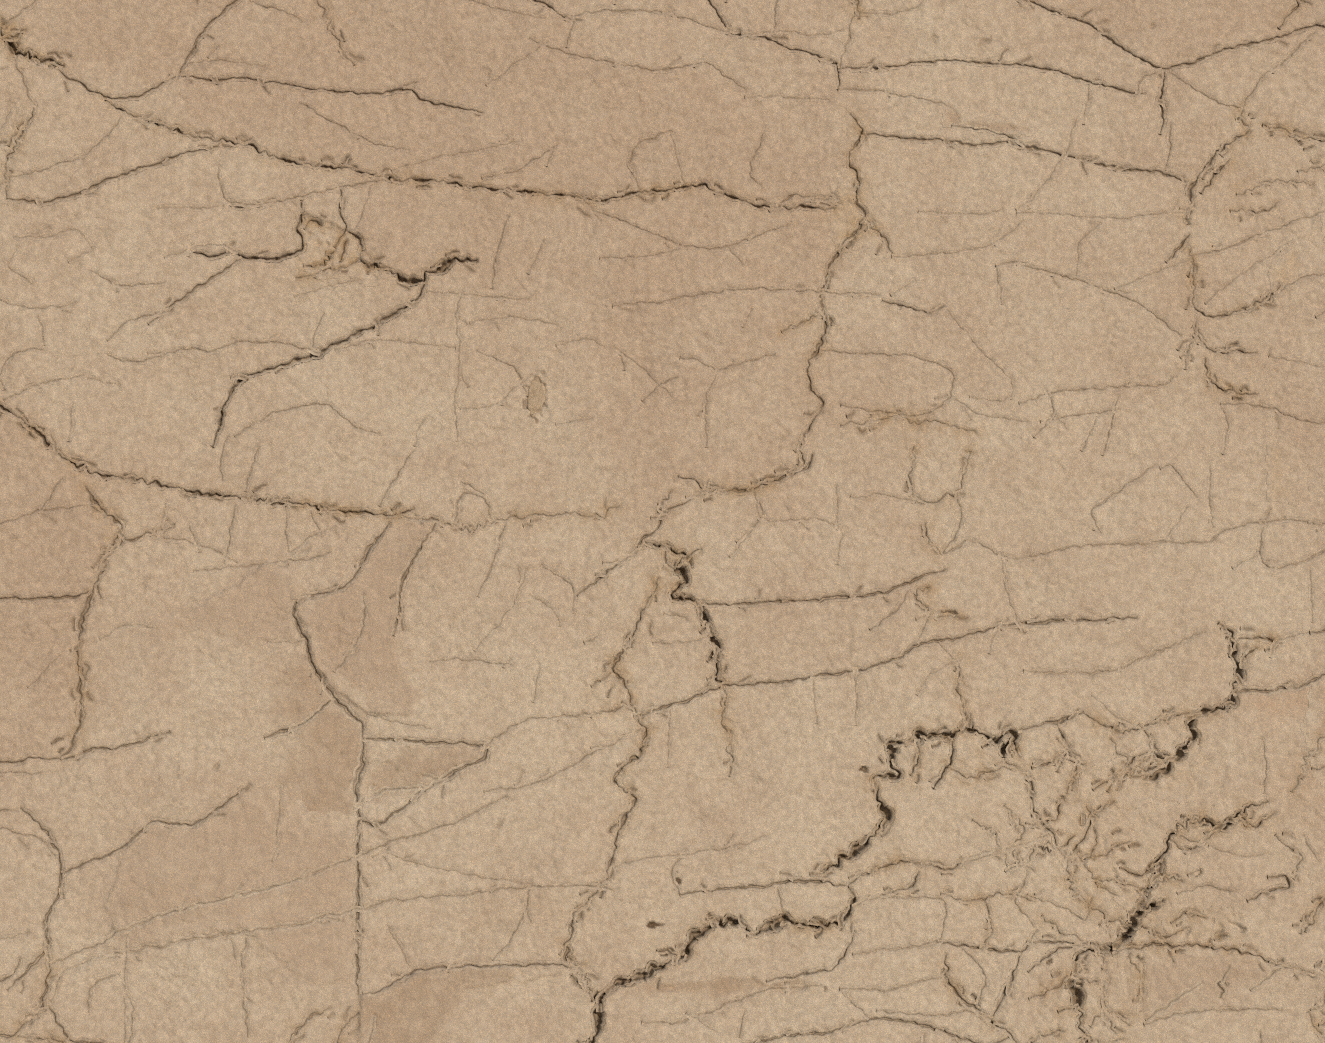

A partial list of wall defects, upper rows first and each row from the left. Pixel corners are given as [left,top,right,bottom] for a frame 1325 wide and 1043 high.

crack [1230,122,1325,221]
crack [994,209,1325,337]
crack [1019,375,1176,456]
crack [1176,320,1257,369]
crack [1202,359,1325,455]
crack [850,446,1325,574]
crack [1017,621,1325,793]
crack [810,715,1022,878]
crack [947,758,1076,860]
crack [0,784,251,1043]
crack [642,923,857,1038]
crack [744,799,1325,1043]